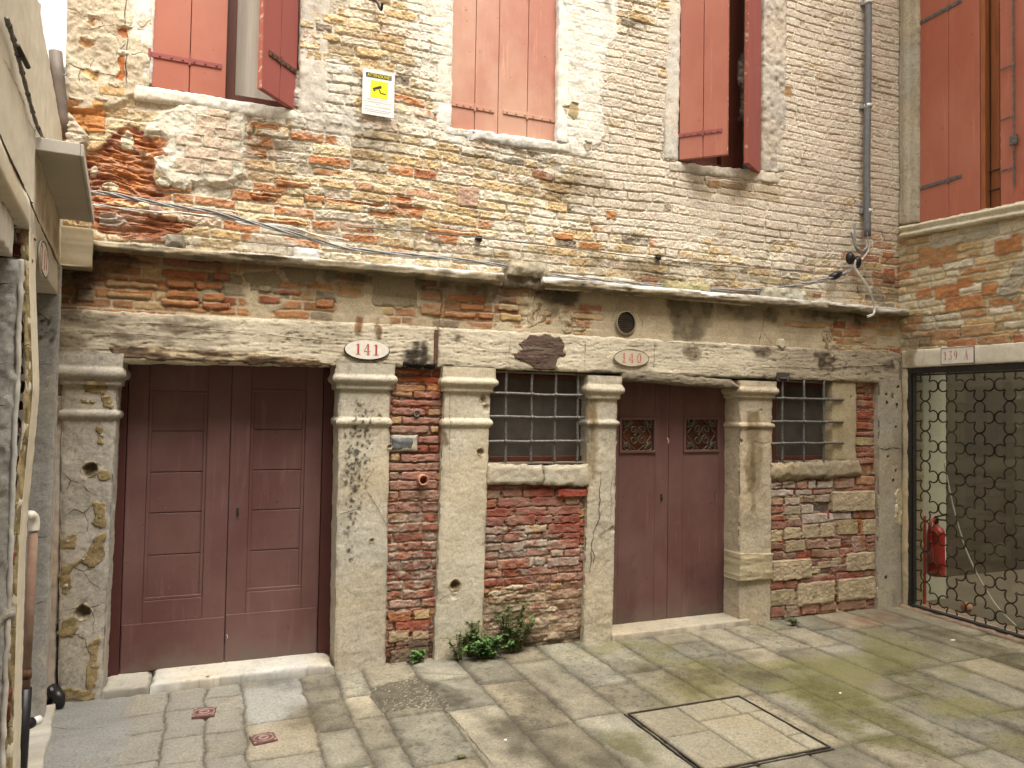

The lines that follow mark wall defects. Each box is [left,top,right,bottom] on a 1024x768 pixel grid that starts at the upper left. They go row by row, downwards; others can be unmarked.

peeling [79,13,100,49]
peeling [67,22,133,108]
spalling [85,126,195,241]
peeling [211,179,233,189]
water stain [667,299,713,358]
peeling [80,380,114,409]
spalling [80,461,111,481]
water stain [344,401,374,529]
peeling [57,501,108,595]
crack [589,474,614,572]
peeling [56,603,93,638]
peeling [61,638,101,702]